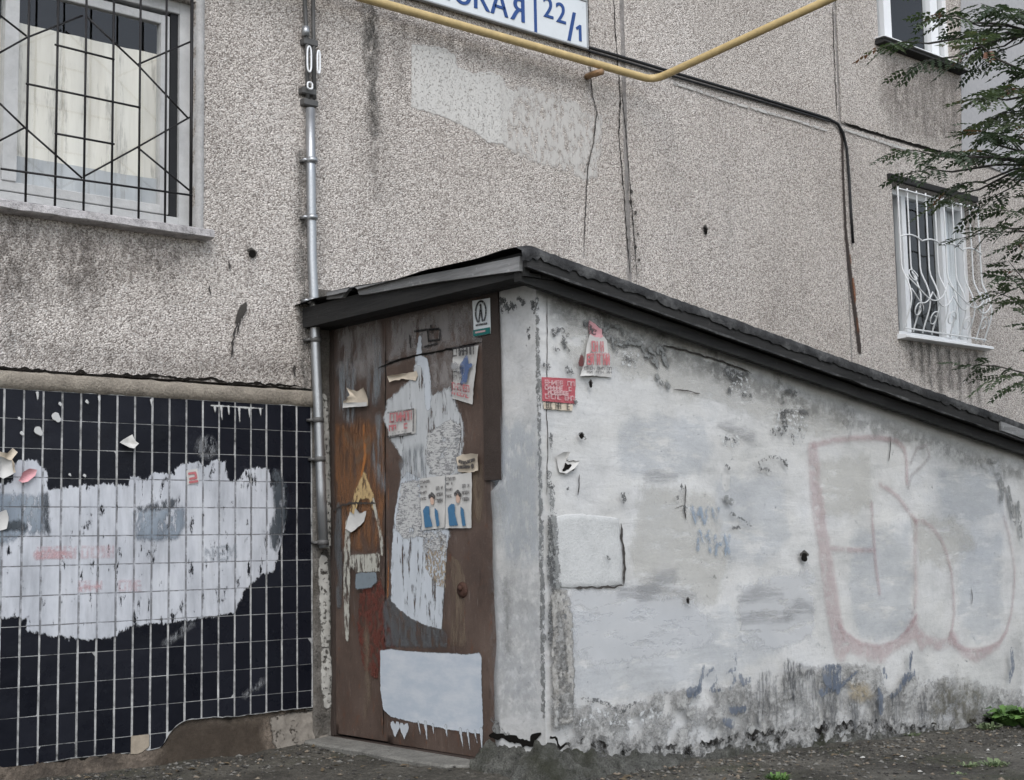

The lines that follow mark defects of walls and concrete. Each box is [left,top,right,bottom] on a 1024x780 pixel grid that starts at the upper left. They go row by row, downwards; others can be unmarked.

leakage [367,7,376,101]
crack [583,0,637,270]
peeling [269,394,332,748]
corrosion [336,422,389,549]
corrosion [357,567,399,679]
peeling [499,296,1024,757]